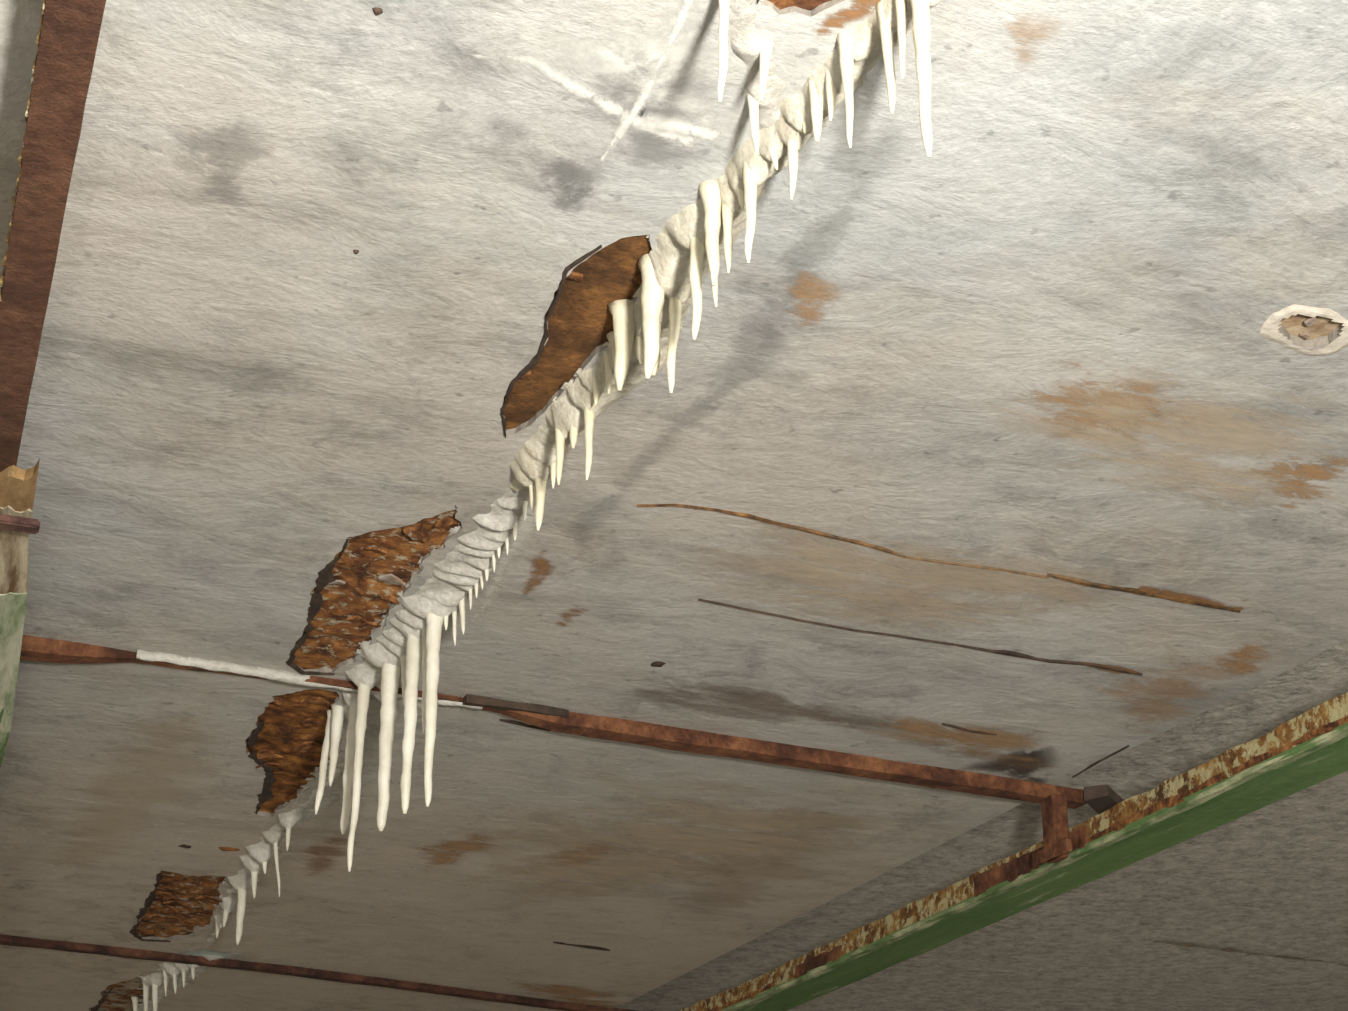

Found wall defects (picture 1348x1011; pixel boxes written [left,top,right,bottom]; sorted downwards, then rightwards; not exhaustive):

spalling [757,0,831,11]
spalling [500,235,652,438]
spalling [1260,304,1348,356]
water stain [131,0,942,1011]
crack [637,504,1243,613]
spalling [246,510,461,814]
rust [888,719,1029,760]
water stain [978,751,1047,782]
rust [1068,716,1348,851]
spalling [129,871,226,942]
rust [974,846,1044,897]
rust [795,945,842,979]